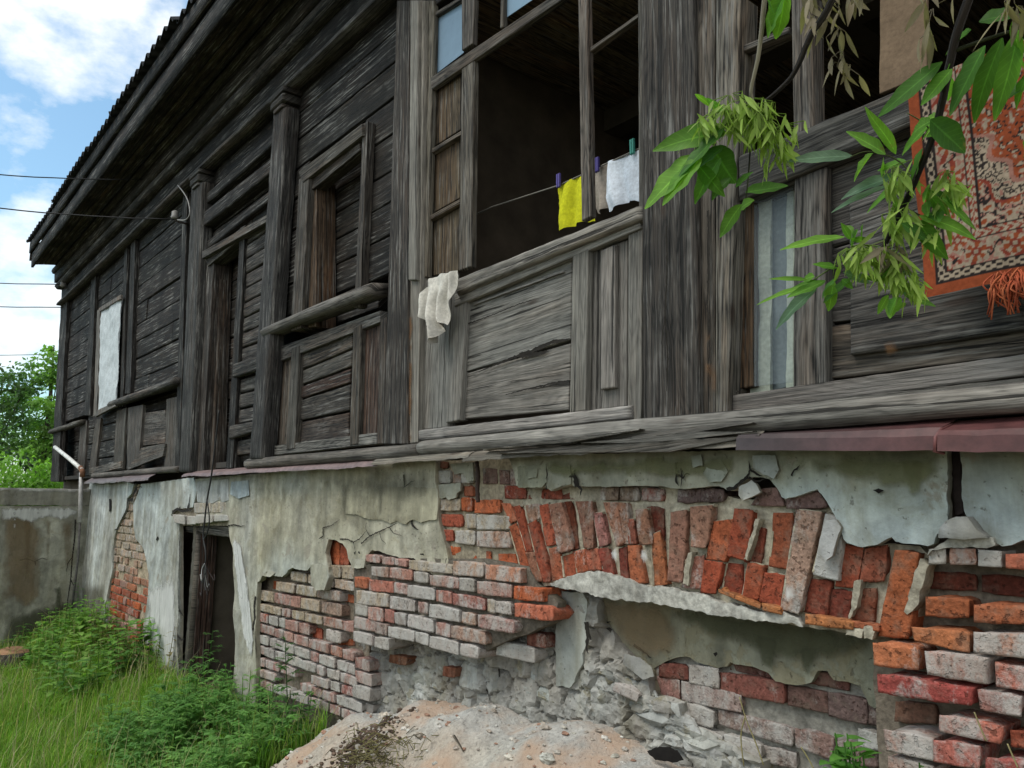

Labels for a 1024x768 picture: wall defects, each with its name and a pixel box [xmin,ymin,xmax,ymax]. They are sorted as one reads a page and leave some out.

spalling [108,484,149,648]
crack [319,519,418,549]
spalling [259,455,1024,768]